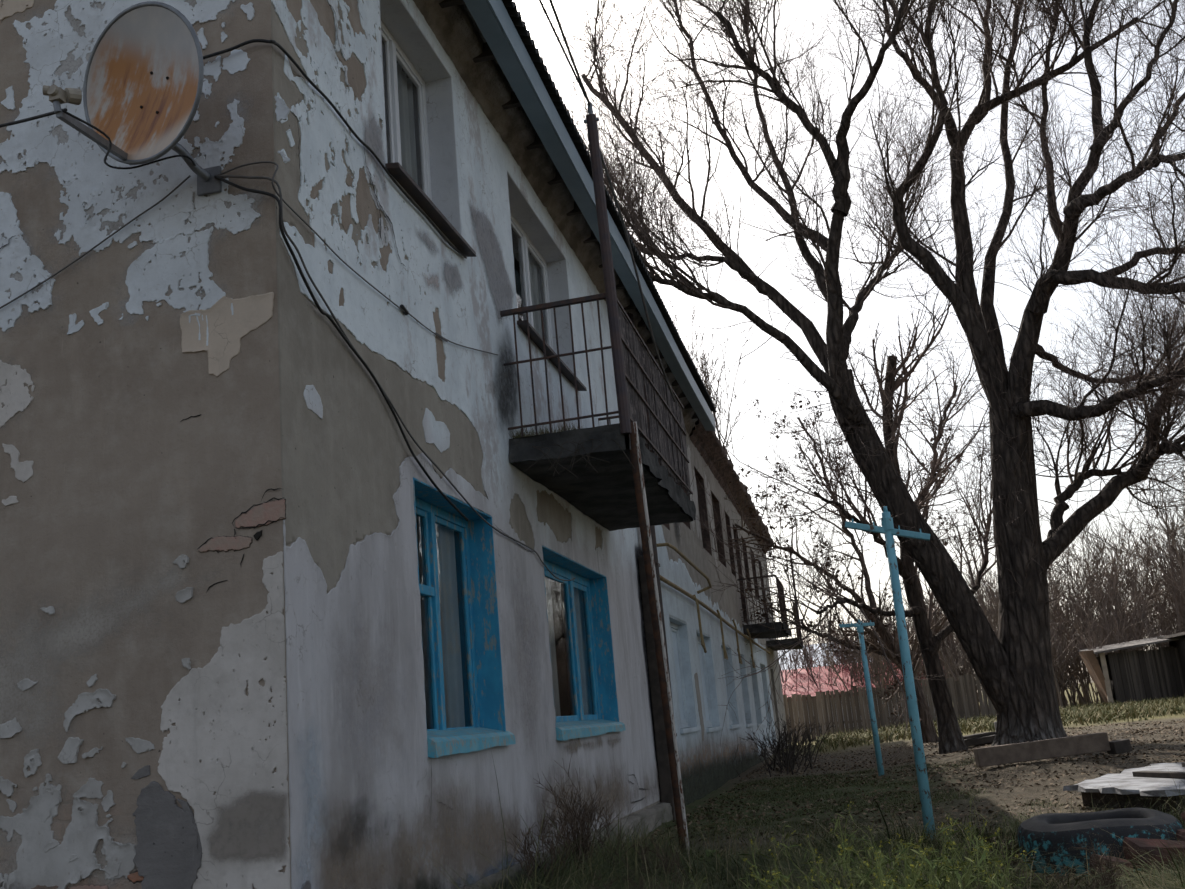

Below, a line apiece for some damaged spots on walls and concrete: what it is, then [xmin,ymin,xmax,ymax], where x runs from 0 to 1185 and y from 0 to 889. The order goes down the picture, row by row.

damp [470,208,513,321]
damp [496,346,517,425]
flaking render [0,0,486,889]